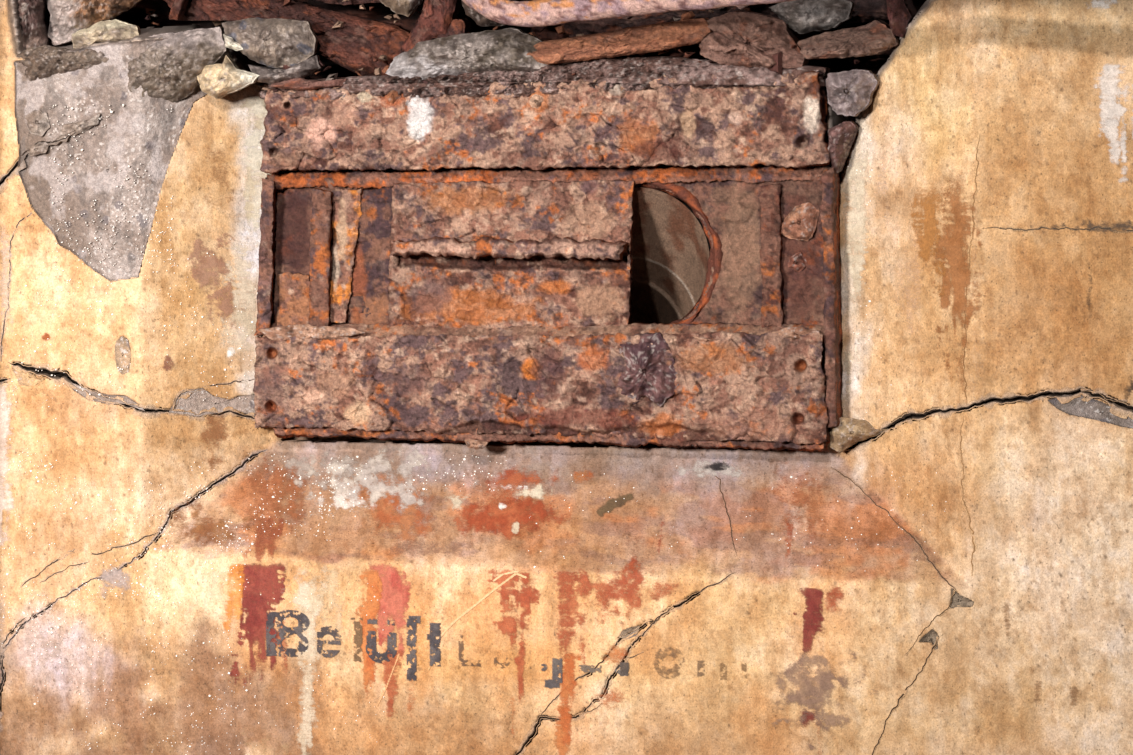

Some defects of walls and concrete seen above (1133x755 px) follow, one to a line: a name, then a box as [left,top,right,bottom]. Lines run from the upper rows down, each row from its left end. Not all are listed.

spalling [14,38,207,282]
crack [0,212,255,422]
peeling [187,233,233,320]
rust [172,464,305,682]
rust [258,324,366,340]
rust [369,470,562,555]
crack [515,475,738,755]
leakage [911,187,982,378]
crack [830,134,1133,755]
spalling [1048,395,1133,428]
leakage [1077,221,1133,231]
leakage [1095,65,1133,182]